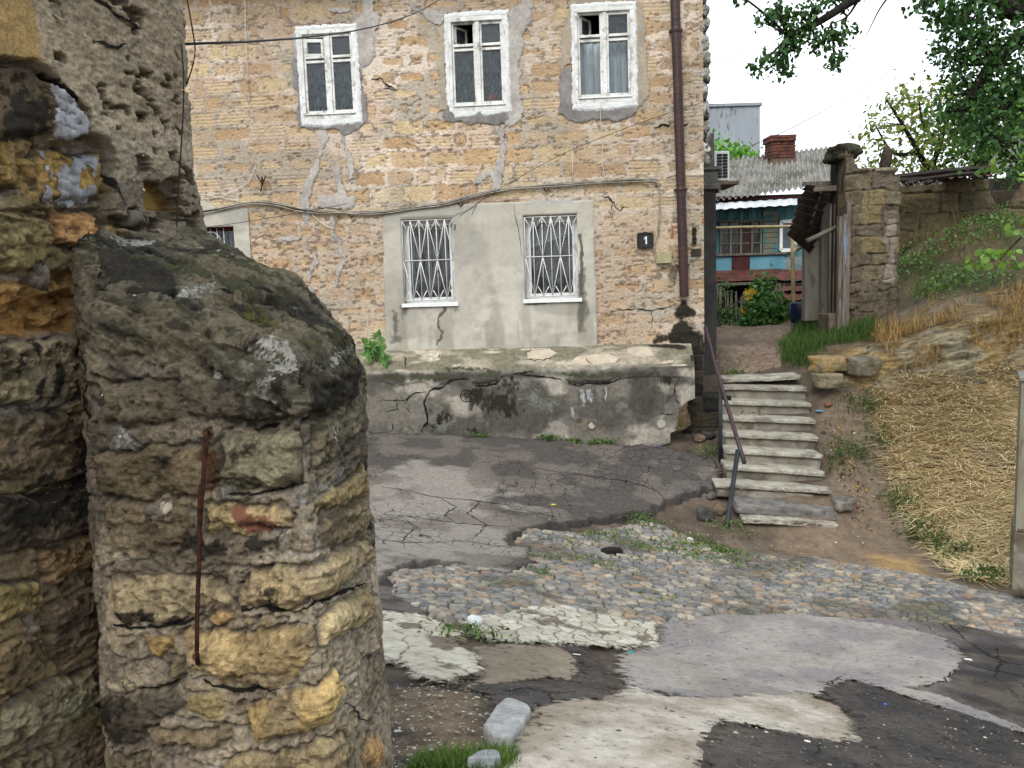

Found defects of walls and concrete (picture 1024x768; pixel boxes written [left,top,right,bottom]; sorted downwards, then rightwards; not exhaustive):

flaking render [49,84,90,141]
peeling [38,150,98,208]
water stain [578,274,586,331]
water stain [649,300,704,353]
crack [384,306,632,434]
water stain [465,375,574,418]
crack [383,487,527,550]